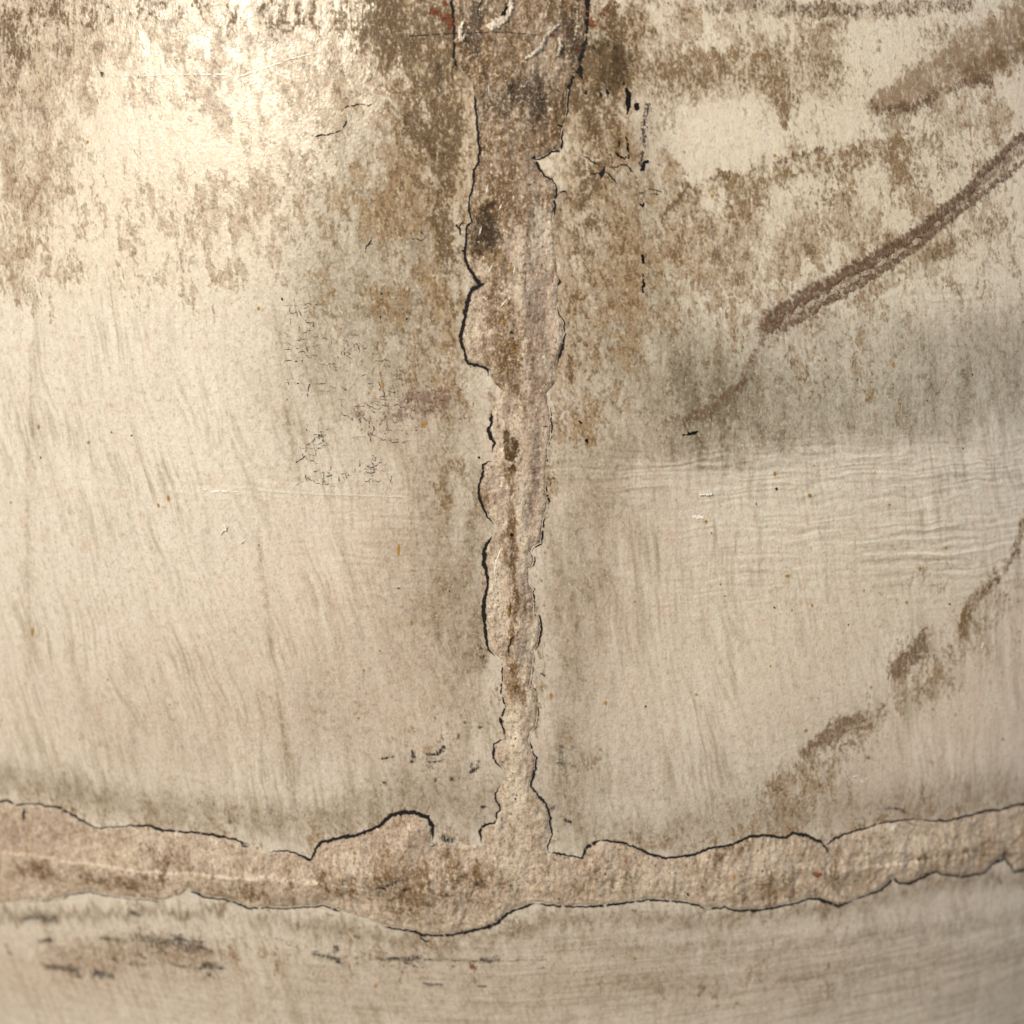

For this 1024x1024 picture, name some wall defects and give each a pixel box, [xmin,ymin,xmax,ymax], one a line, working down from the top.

crack [409,0,536,67]
crack [529,0,633,218]
leakage [582,42,841,130]
leakage [664,0,1024,232]
leakage [684,132,1024,424]
crack [285,94,1024,860]
leakage [959,572,1000,638]
leakage [888,628,934,679]
leakage [795,705,886,770]
crack [0,799,436,861]
crack [188,890,339,912]
crack [383,850,1024,942]